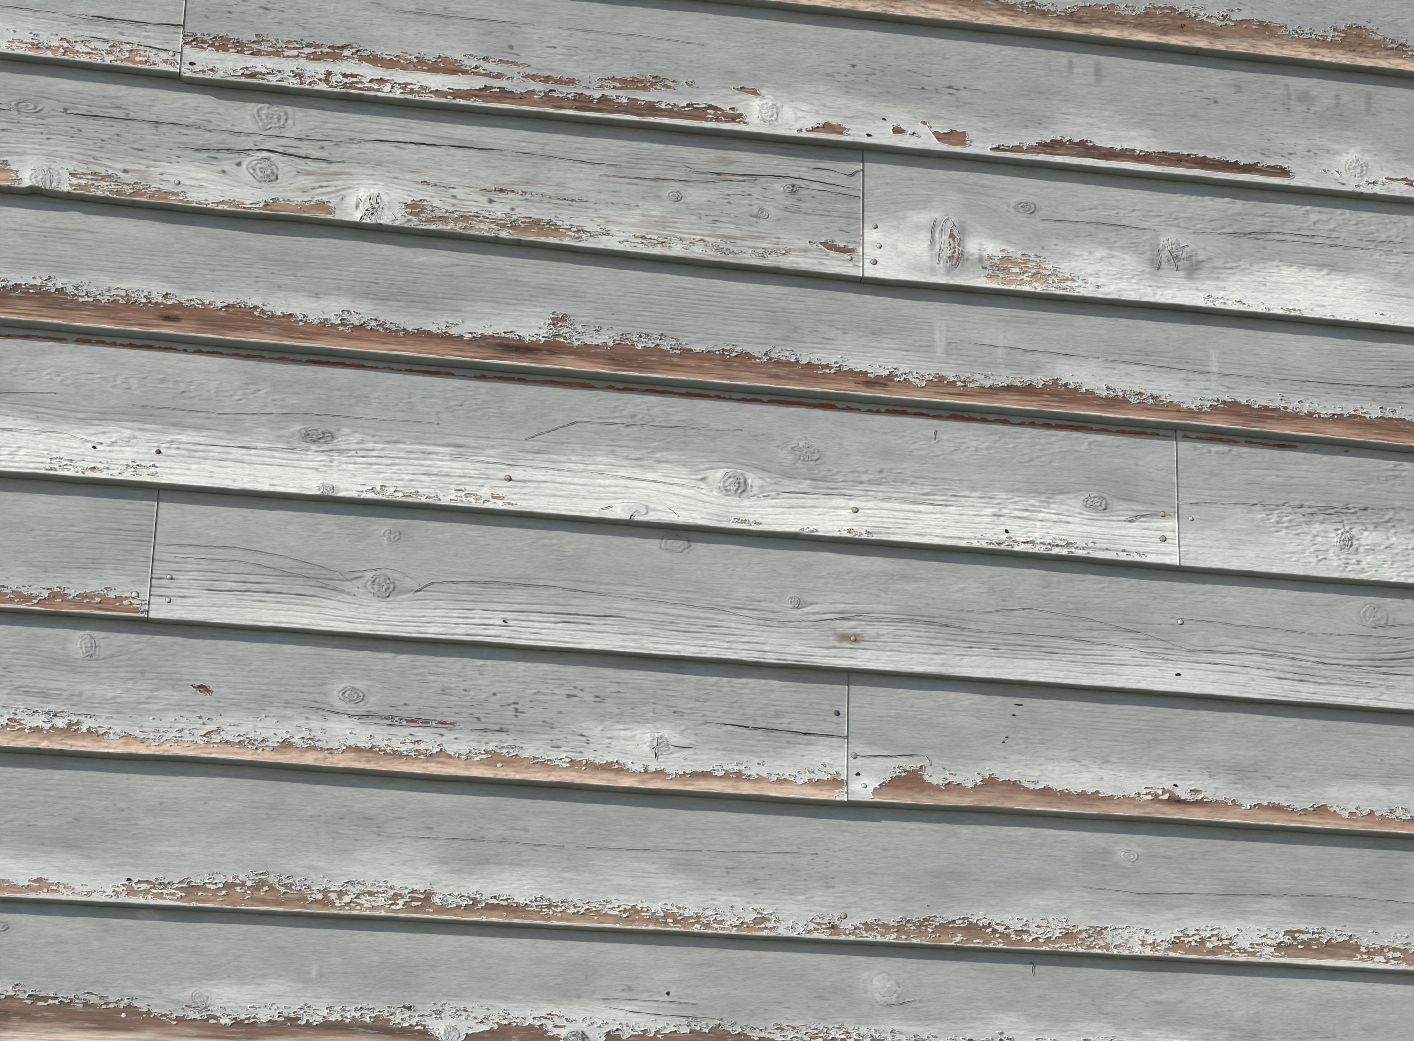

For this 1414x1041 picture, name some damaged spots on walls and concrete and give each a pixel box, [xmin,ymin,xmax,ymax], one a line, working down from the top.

peeling [771,0,1414,71]
peeling [4,29,763,125]
peeling [65,167,335,217]
peeling [396,180,790,259]
peeling [890,120,972,148]
peeling [988,135,1295,180]
peeling [0,275,1414,453]
peeling [0,584,146,615]
peeling [0,705,846,799]
peeling [870,764,1414,833]
peeling [0,870,1414,967]
peeling [0,982,1128,1041]